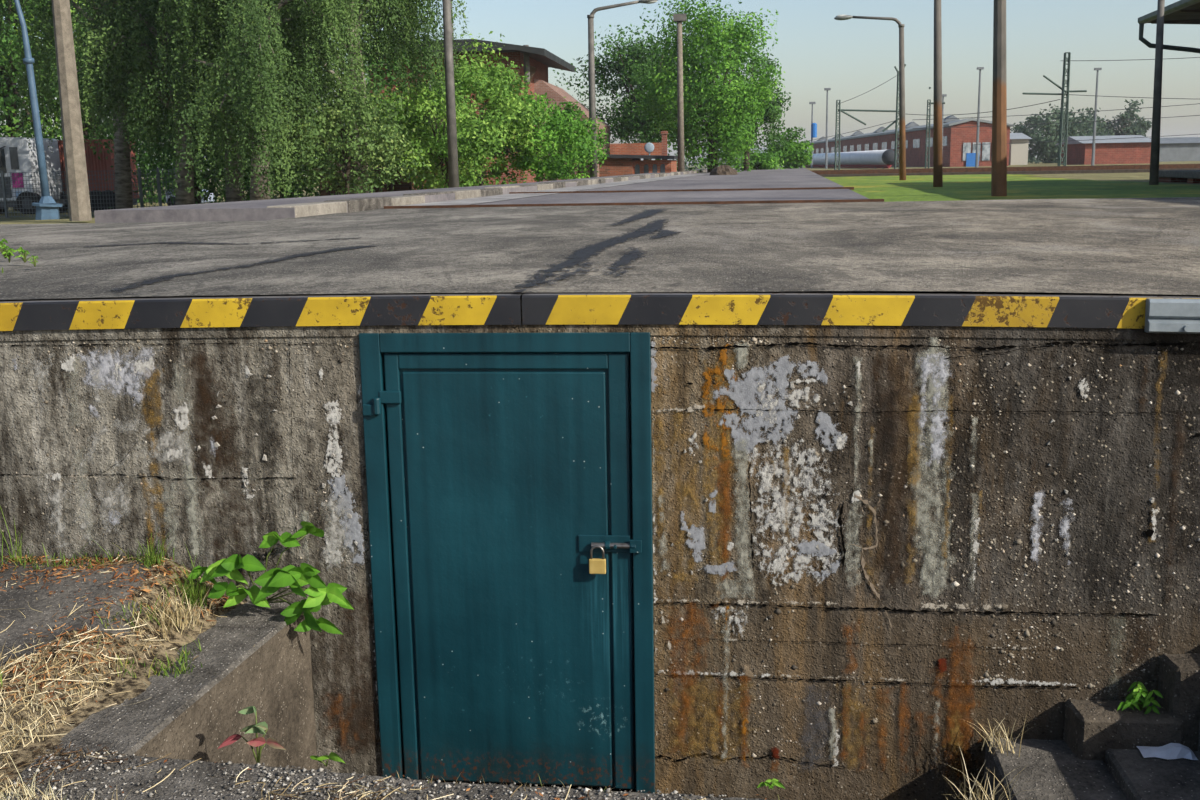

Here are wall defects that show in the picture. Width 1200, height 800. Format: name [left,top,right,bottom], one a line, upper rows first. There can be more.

spalling [220,336,360,374]
damp [36,348,242,556]
peeling [291,391,366,566]
rust [680,344,739,578]
damp [846,490,861,579]
damp [854,337,952,600]
peeling [650,335,1200,759]
damp [971,493,981,581]
rust [669,609,753,761]
rust [936,637,978,781]